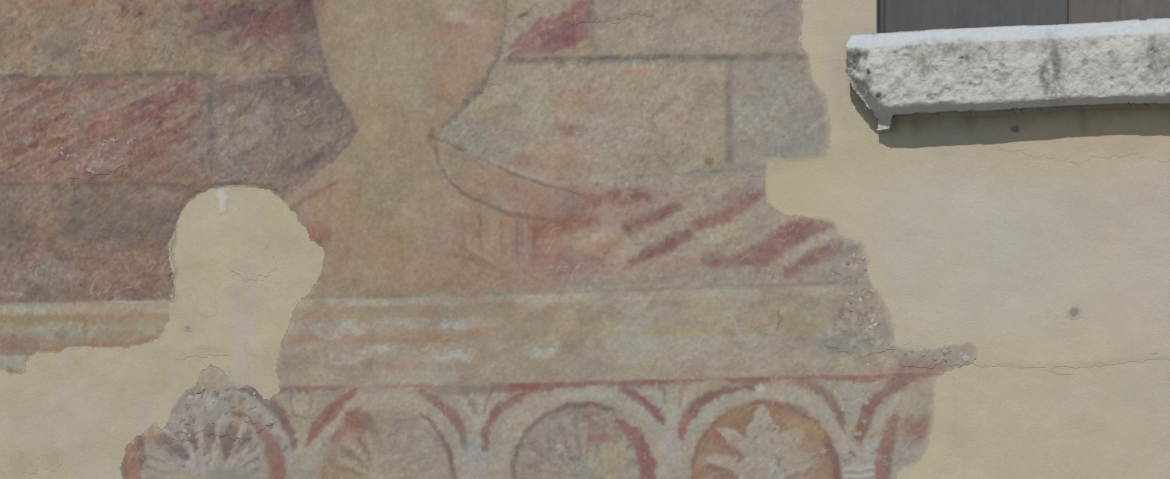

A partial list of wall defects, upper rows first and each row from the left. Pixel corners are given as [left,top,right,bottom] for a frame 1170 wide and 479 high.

flaking render [0,186,324,479]